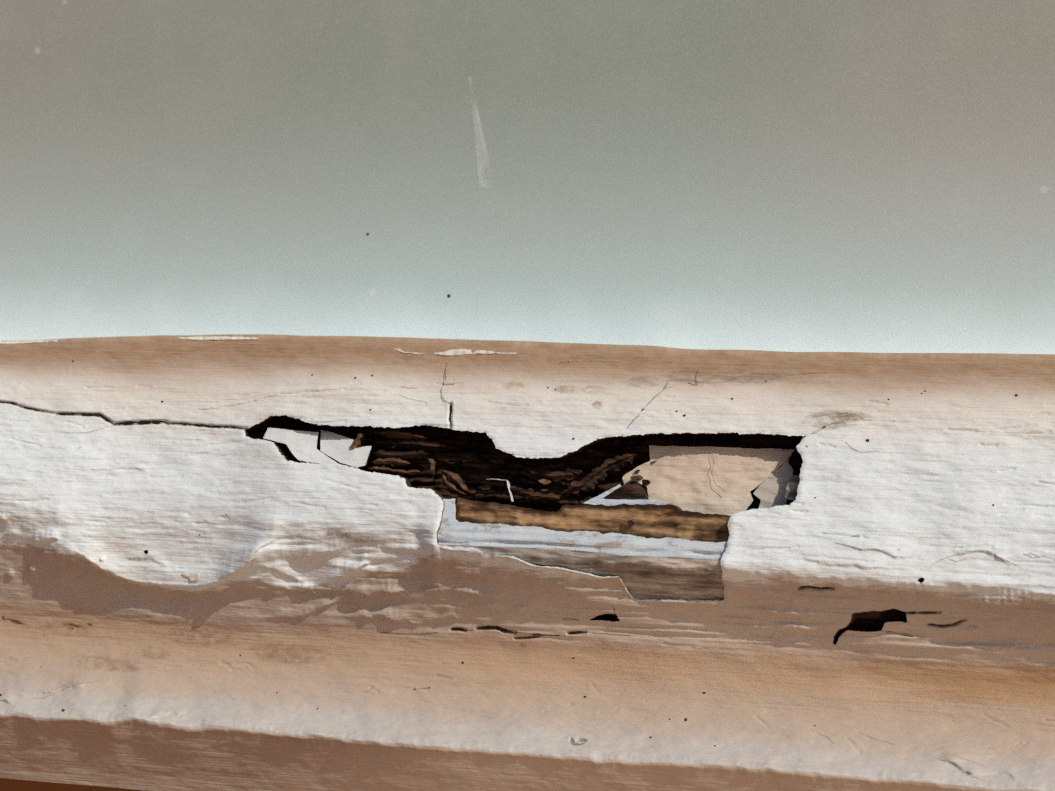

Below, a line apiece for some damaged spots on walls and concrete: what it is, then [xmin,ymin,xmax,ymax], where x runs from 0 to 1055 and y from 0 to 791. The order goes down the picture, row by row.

crack [0,401,245,434]
peeling [263,428,372,468]
crack [401,364,455,429]
peeling [584,445,795,516]
peeling [437,498,728,604]